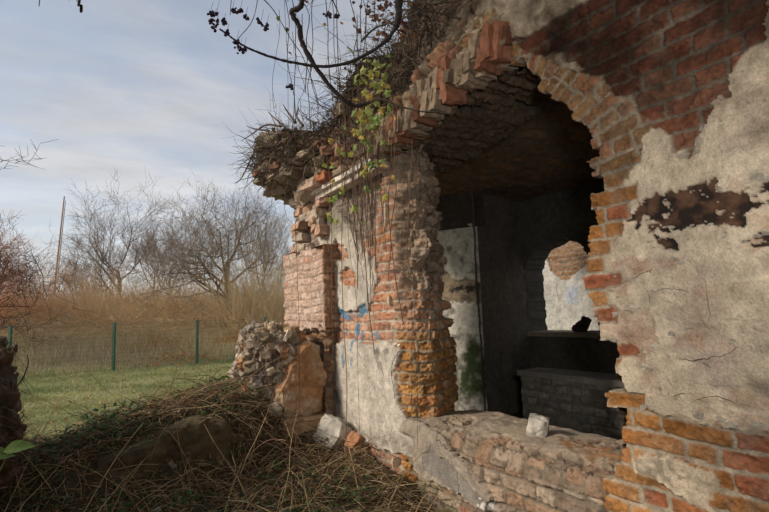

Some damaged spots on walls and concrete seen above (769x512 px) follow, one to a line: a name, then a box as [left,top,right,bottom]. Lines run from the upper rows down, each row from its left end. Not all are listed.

spalling [394,453,418,483]
spalling [332,0,769,419]
spalling [602,173,769,512]